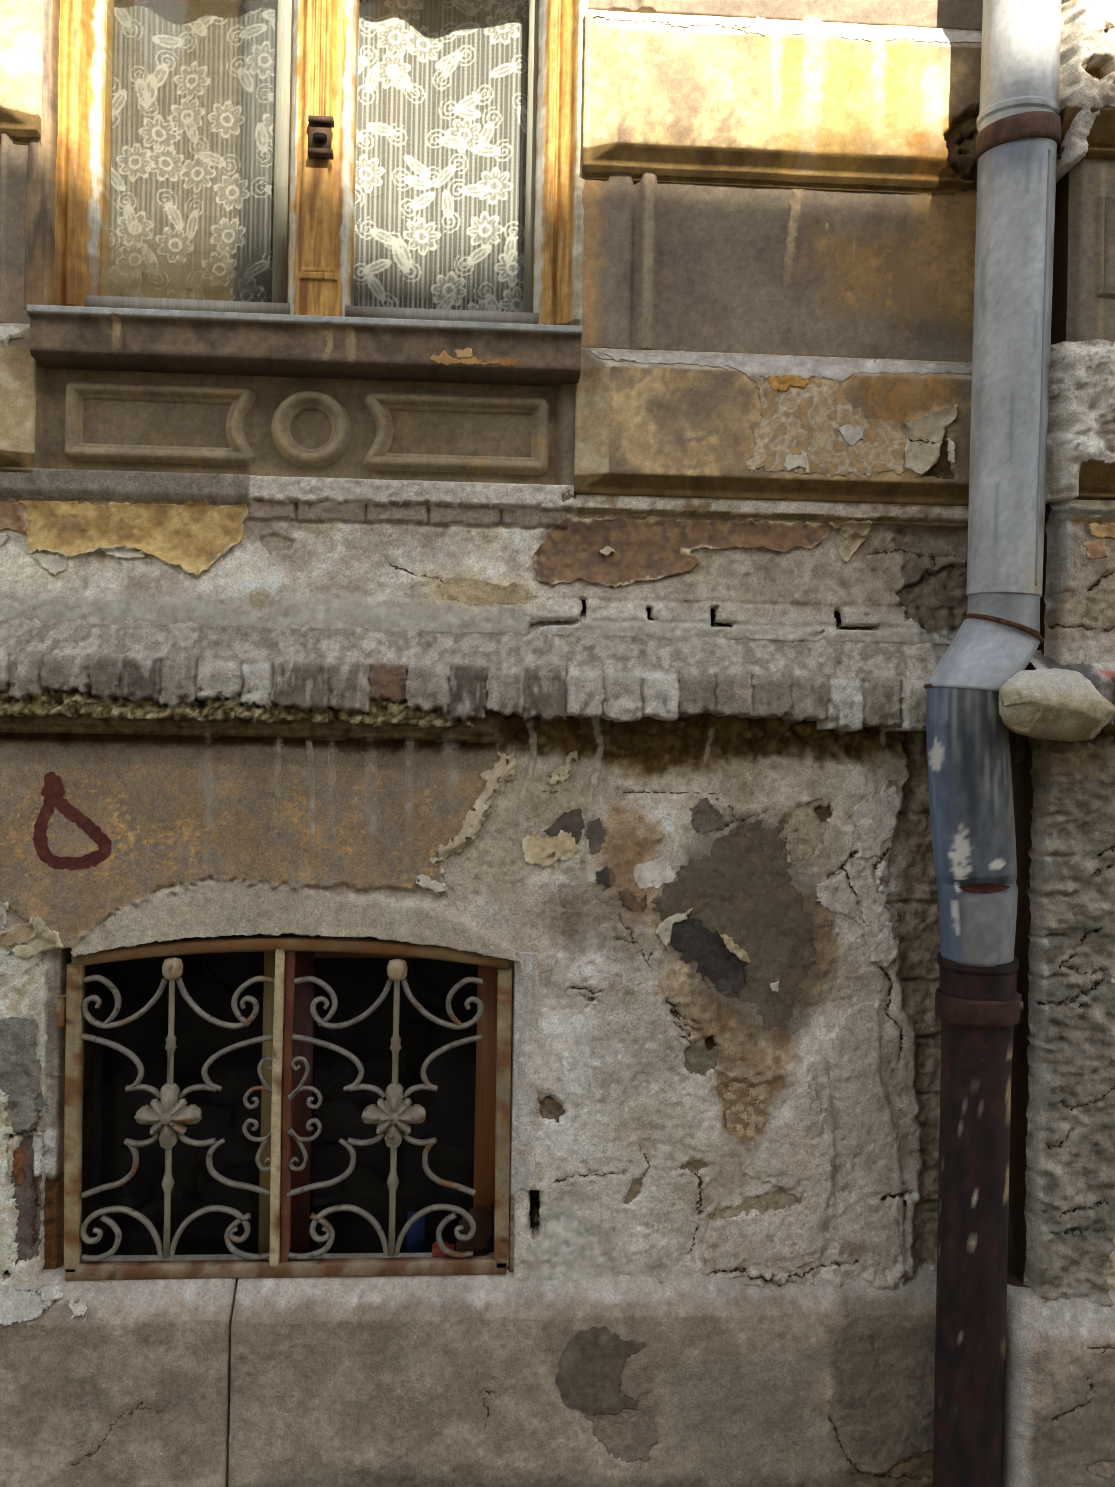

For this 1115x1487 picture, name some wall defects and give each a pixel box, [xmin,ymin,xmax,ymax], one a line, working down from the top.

damp [770,22,782,103]
damp [803,18,826,128]
damp [870,29,885,98]
damp [786,182,803,265]
flaking render [590,350,972,480]
peeling [0,499,295,576]
crack [1093,845,1115,876]
flaking render [522,779,902,1034]
crack [1036,928,1105,1009]
flaking render [822,1002,907,1290]
crack [1044,1086,1115,1148]
crack [828,1415,930,1481]